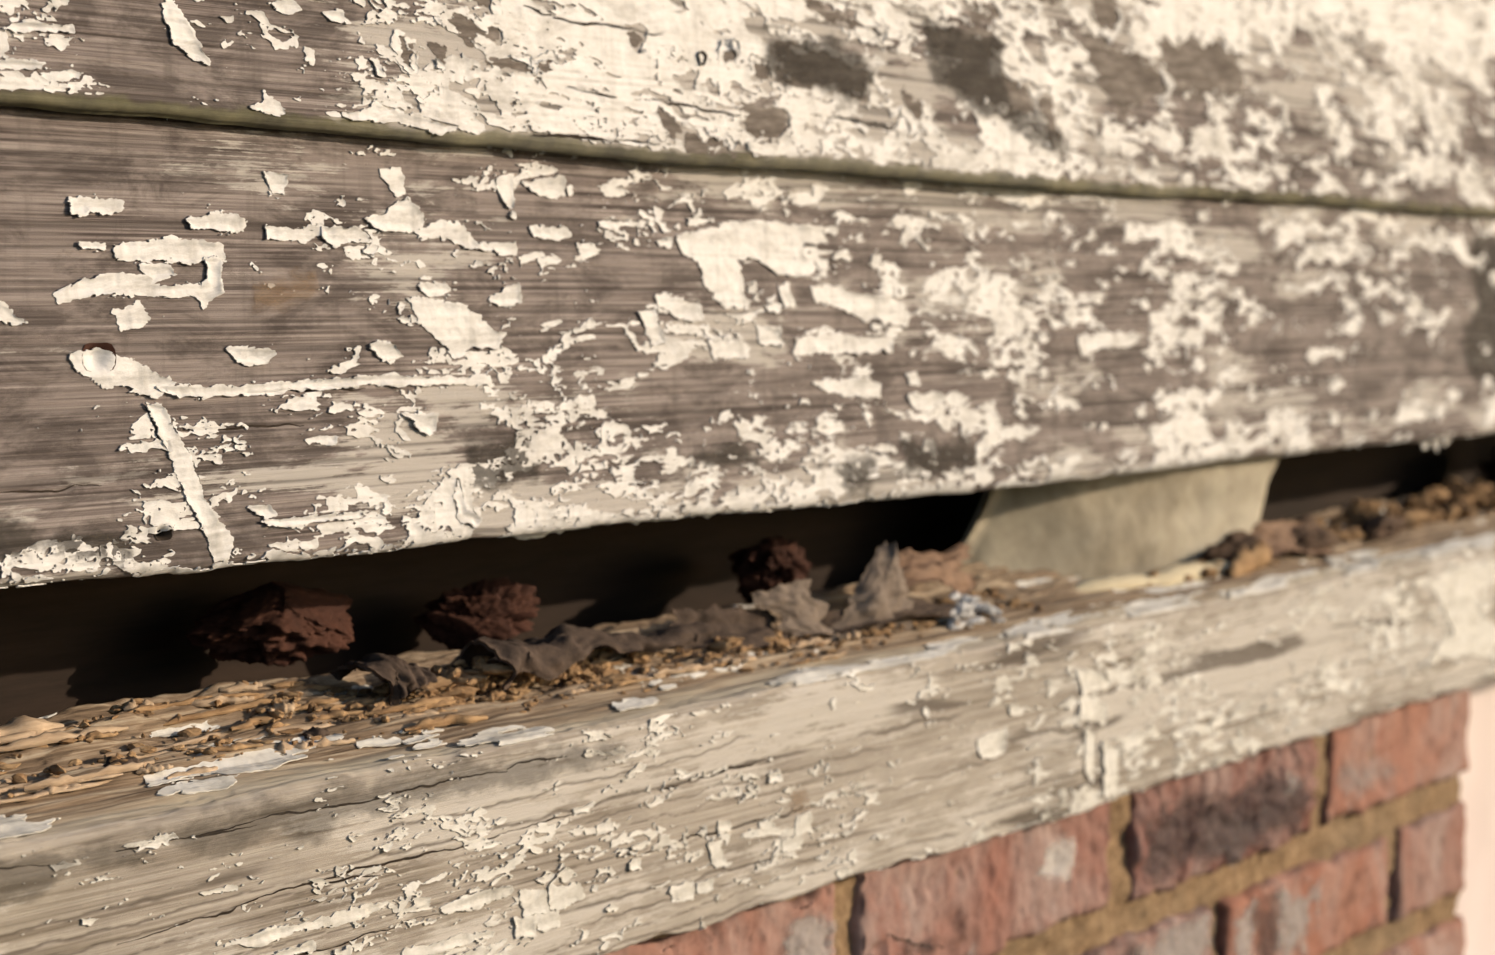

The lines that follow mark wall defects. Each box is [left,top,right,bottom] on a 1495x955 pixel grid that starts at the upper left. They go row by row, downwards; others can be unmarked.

peeling [161,0,211,66]
peeling [369,0,560,78]
peeling [1082,0,1245,117]
peeling [341,101,460,136]
peeling [656,102,788,159]
peeling [52,167,572,332]
peeling [597,215,910,361]
peeling [1077,330,1142,357]
peeling [812,376,881,400]
peeling [68,281,523,563]
peeling [216,901,389,955]
peeling [440,882,586,939]